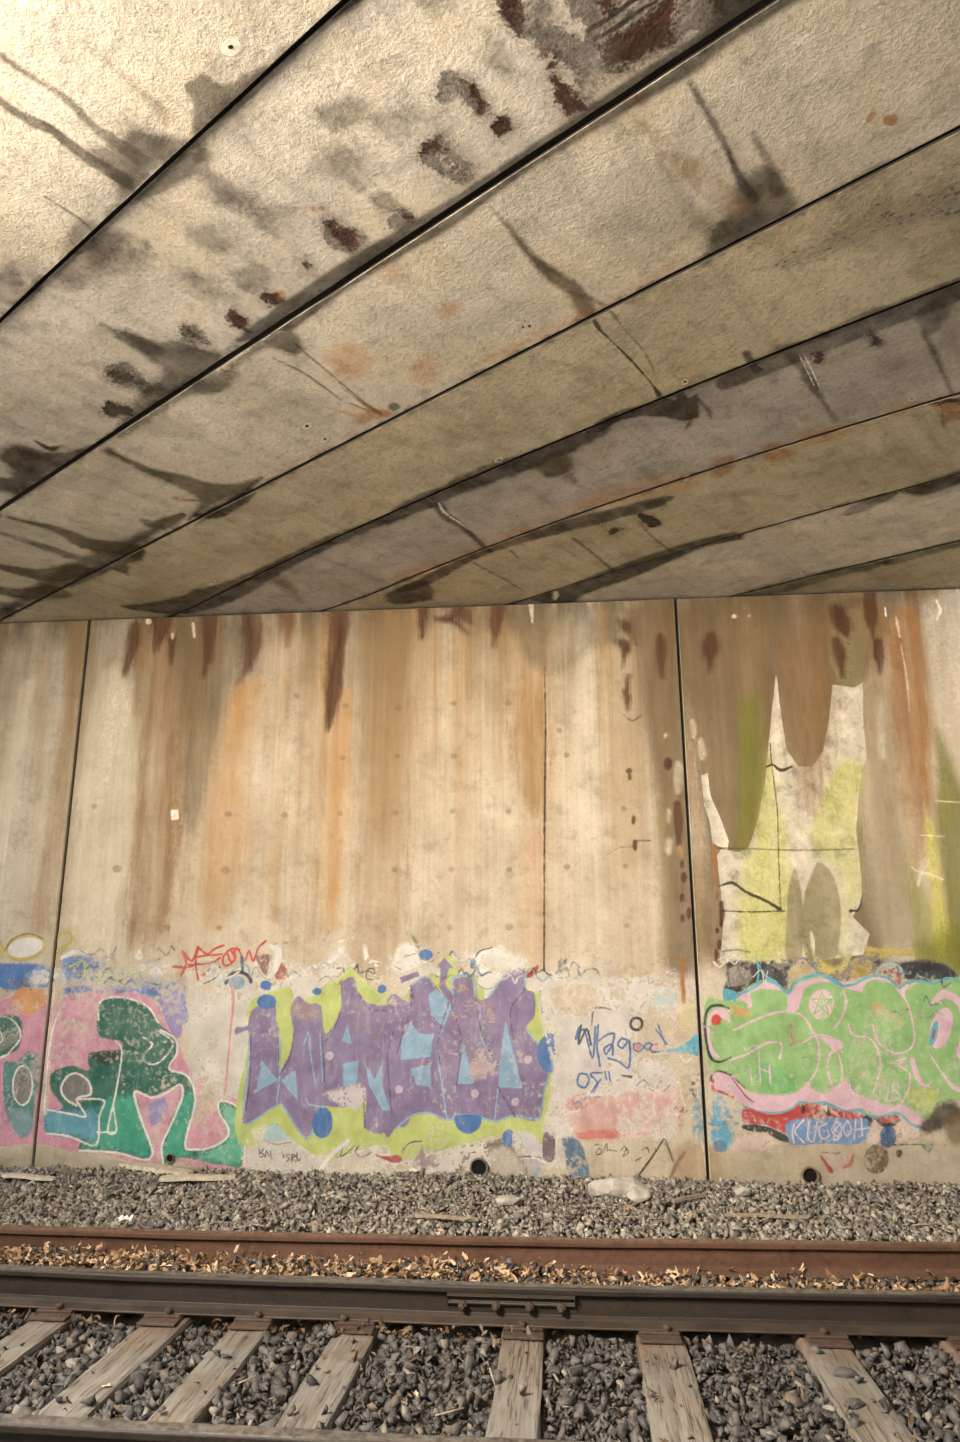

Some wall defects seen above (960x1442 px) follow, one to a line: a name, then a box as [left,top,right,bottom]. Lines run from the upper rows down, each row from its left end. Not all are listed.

leakage [2,100,82,155]
leakage [172,68,267,182]
leakage [237,0,796,355]
leakage [124,332,230,425]
leakage [0,441,258,615]
corrosion [122,618,175,676]
corrosion [202,616,216,676]
corrosion [242,614,261,674]
corrosion [325,611,348,730]
corrosion [418,607,472,638]
corrosion [491,605,504,638]
leakage [634,560,892,975]